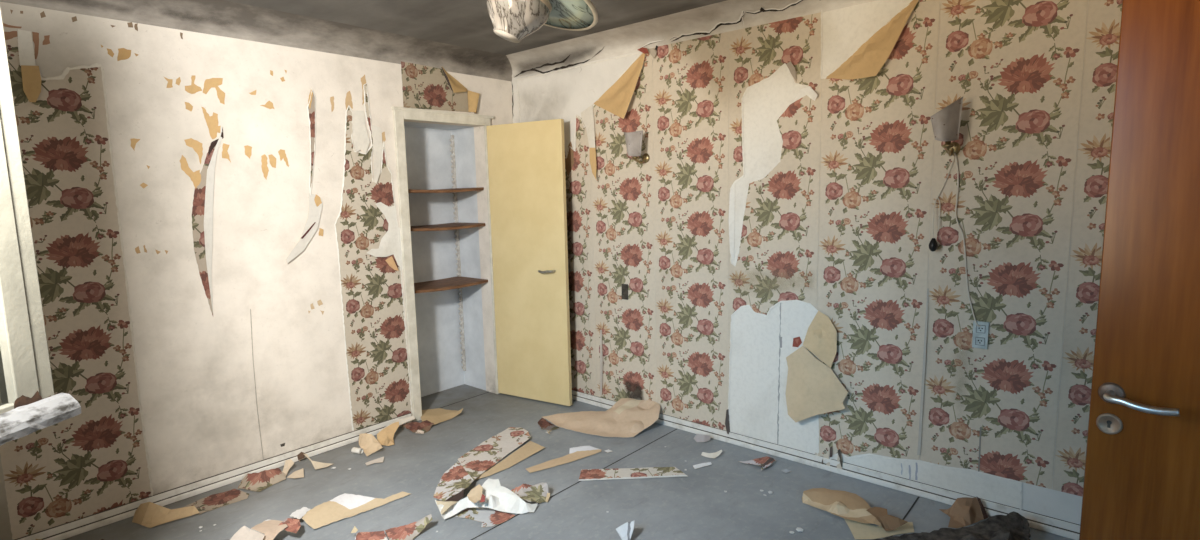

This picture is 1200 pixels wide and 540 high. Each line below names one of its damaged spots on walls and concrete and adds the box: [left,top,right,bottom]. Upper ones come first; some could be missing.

peeling [101,45,138,61]
peeling [163,75,231,188]
peeling [244,145,289,180]
peeling [330,75,367,112]
crack [511,47,604,113]
flaking render [517,45,658,176]
crack [640,0,820,48]
peeling [729,0,919,266]
peeling [725,300,1023,510]